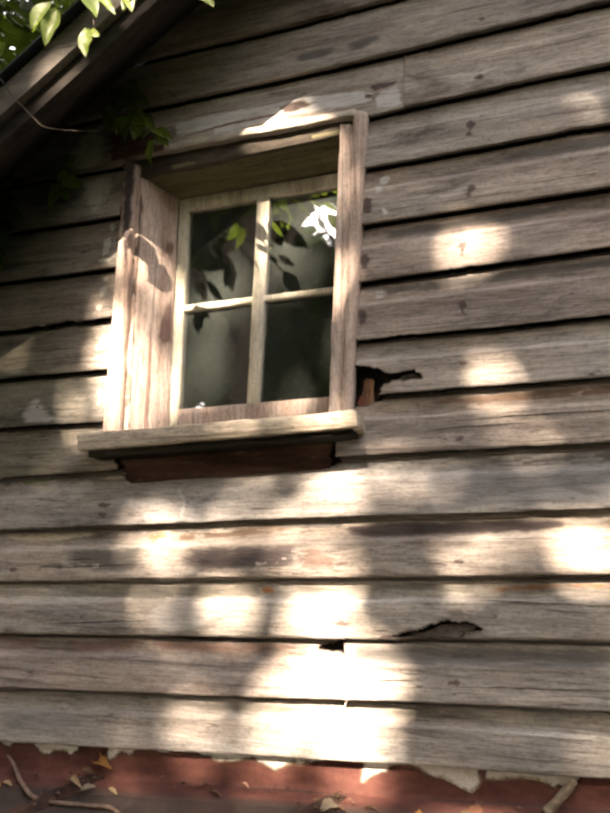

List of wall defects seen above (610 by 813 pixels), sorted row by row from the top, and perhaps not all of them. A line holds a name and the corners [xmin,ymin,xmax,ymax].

leakage [36,450,610,597]
peeling [35,743,79,754]
peeling [108,748,136,759]
peeling [197,752,316,769]
peeling [361,762,580,792]